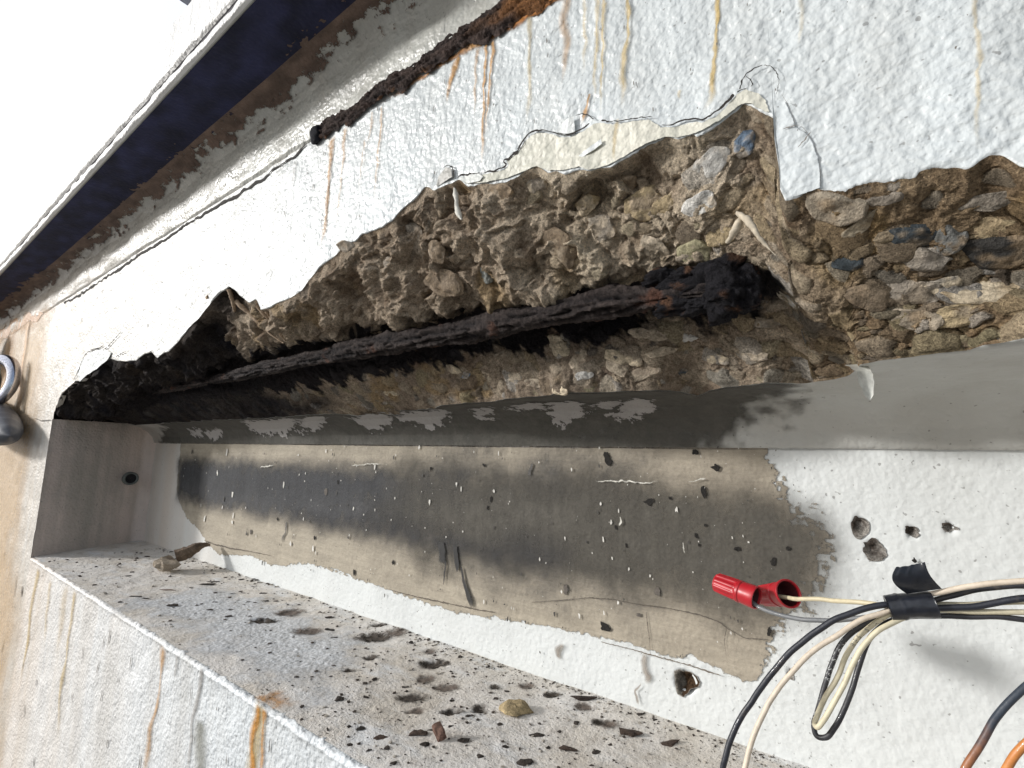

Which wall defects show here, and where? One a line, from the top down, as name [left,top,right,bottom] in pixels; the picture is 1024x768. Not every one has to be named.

corrosion [309,0,554,228]
crack [444,65,821,178]
spalling [55,89,1024,425]
corrosion [641,253,767,327]
damp [177,460,825,616]
damp [128,588,358,680]
corrosion [147,650,164,754]
damp [189,669,203,767]
corrosion [250,692,281,768]